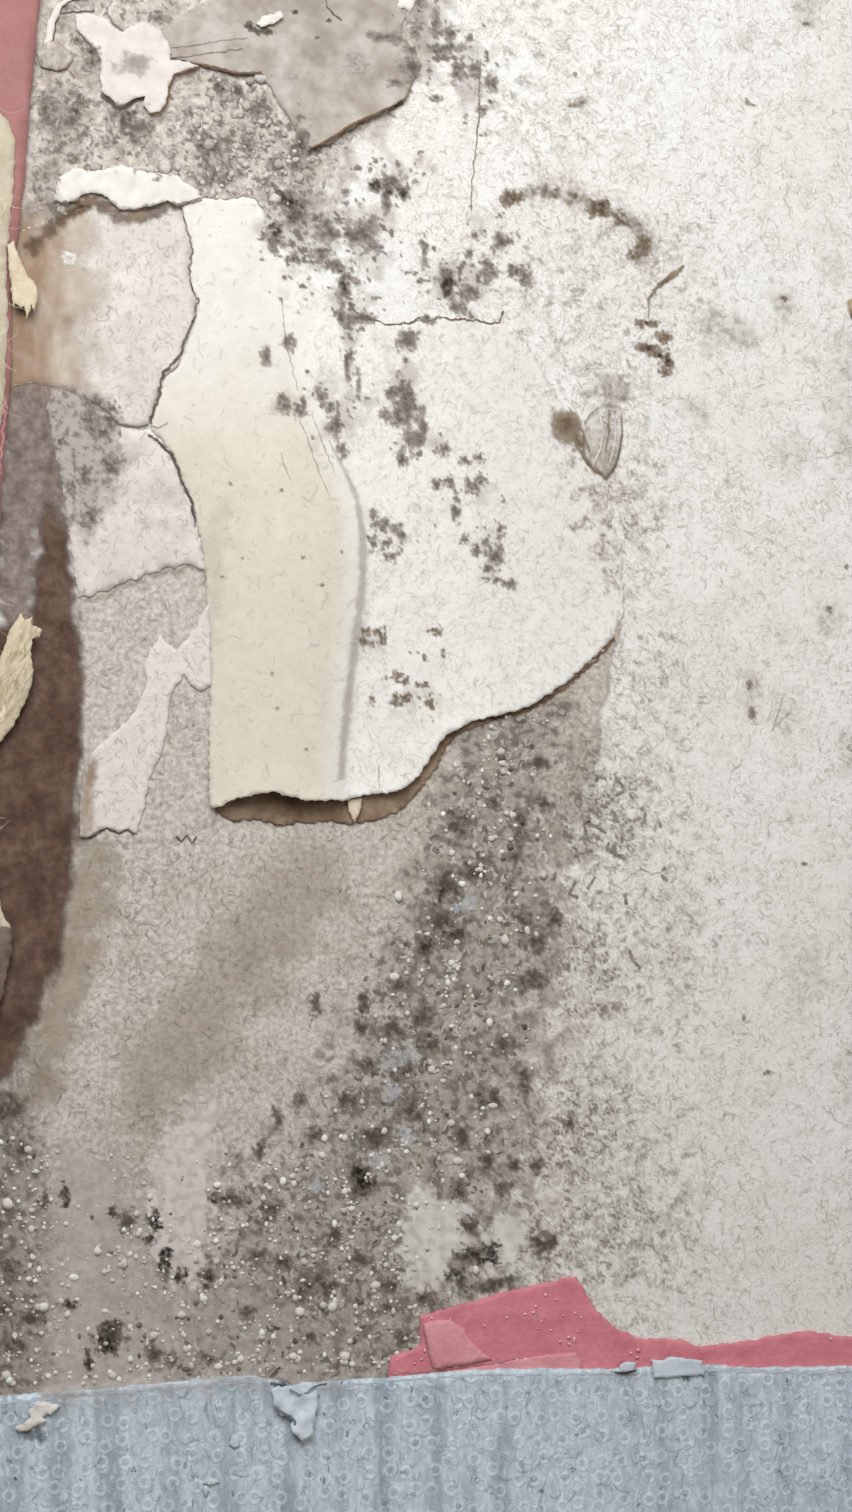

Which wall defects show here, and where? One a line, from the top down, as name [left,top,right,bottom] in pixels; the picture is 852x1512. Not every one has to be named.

crack [82,204,199,526]
peeling [0,0,433,742]
leakage [30,43,651,590]
leakage [635,265,684,377]
peeling [0,553,621,1442]
leakage [0,389,668,1395]